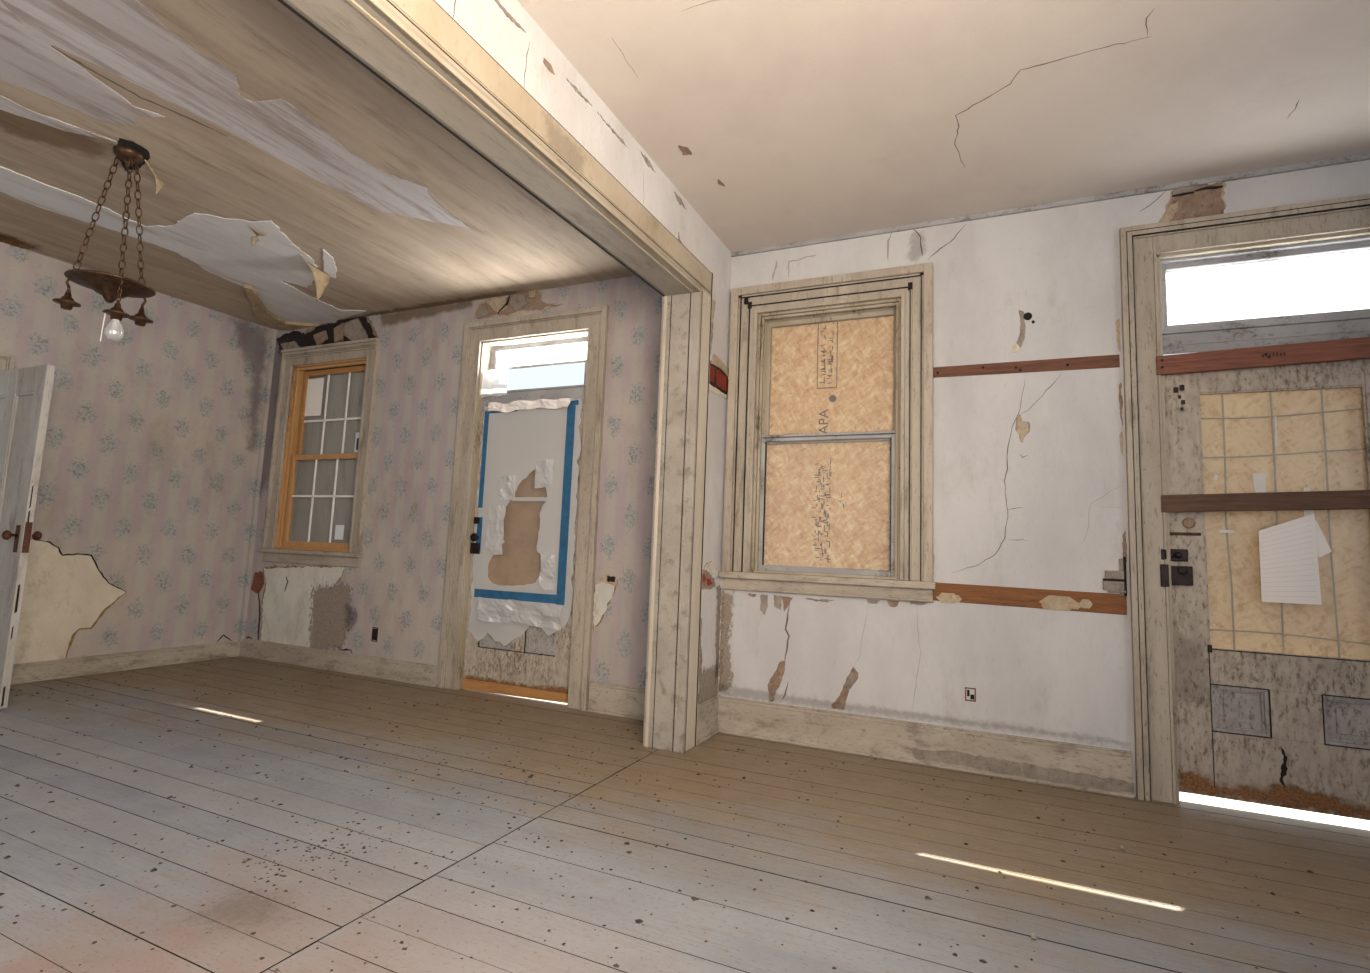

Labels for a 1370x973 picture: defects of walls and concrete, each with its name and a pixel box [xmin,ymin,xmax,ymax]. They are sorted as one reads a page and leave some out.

peeling [494,0,526,33]
crack [954,8,1155,168]
peeling [0,0,472,229]
peeling [543,58,655,172]
flaking render [1158,181,1226,223]
peeling [0,166,378,357]
flaking render [1012,310,1035,352]
crack [952,372,1063,573]
peeling [747,593,833,615]
peeling [866,599,928,607]
peeling [768,661,785,702]
peeling [831,667,859,710]